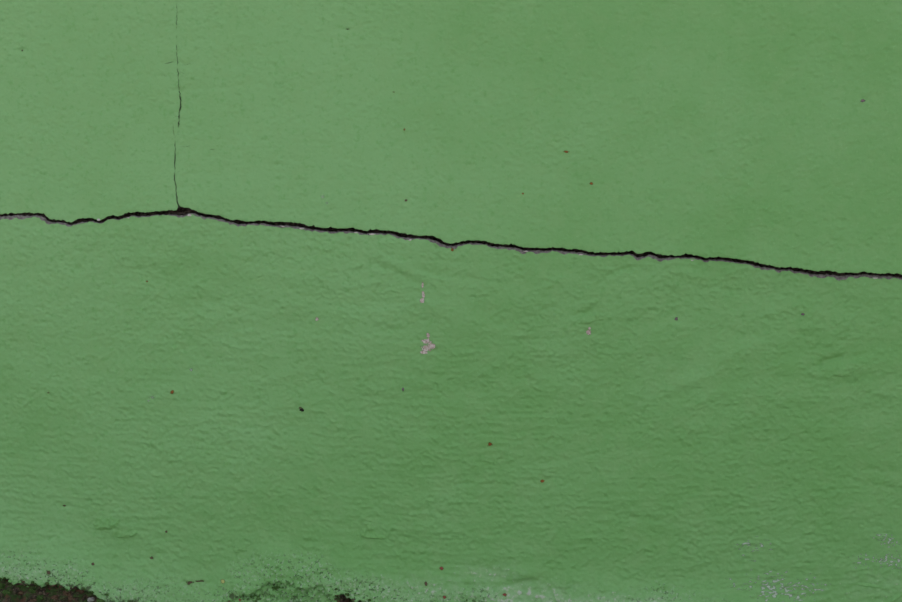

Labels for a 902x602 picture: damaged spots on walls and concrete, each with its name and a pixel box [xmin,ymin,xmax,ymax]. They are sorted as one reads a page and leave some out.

crack [0,148,902,281]
peeling [420,333,435,354]
spalling [0,577,105,602]
spalling [334,588,371,602]